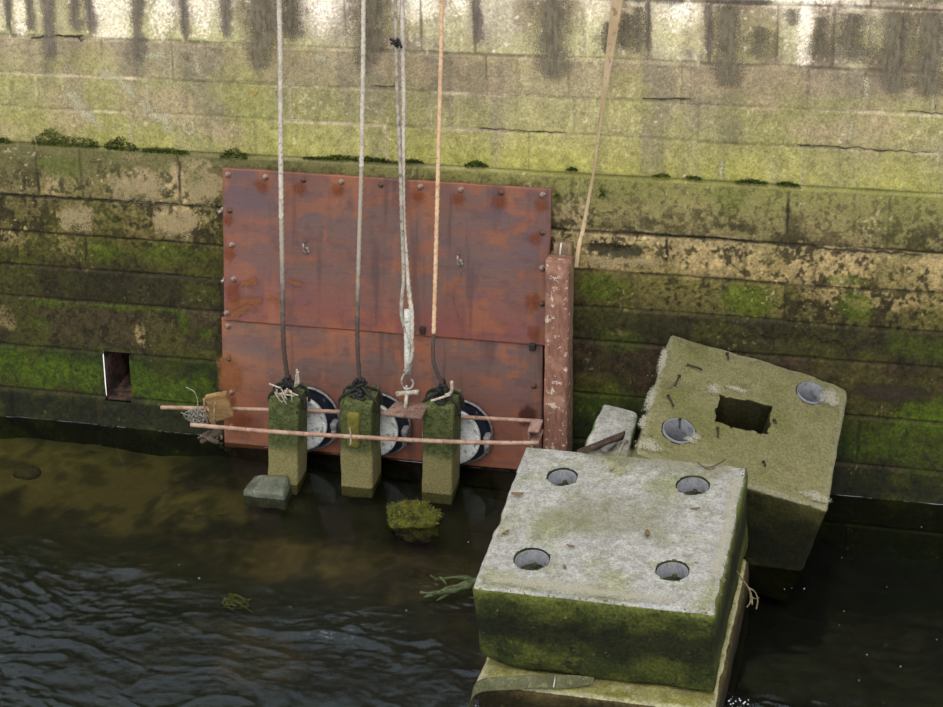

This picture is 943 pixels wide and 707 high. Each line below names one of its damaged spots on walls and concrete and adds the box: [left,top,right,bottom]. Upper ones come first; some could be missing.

damp [3,0,12,29]
damp [25,0,99,57]
damp [129,0,173,72]
damp [178,0,191,38]
damp [218,0,308,69]
damp [528,0,576,78]
damp [598,0,683,53]
damp [703,0,778,86]
damp [804,0,943,106]
crack [798,144,927,153]
corrosion [217,356,250,427]
corrosion [519,407,535,425]